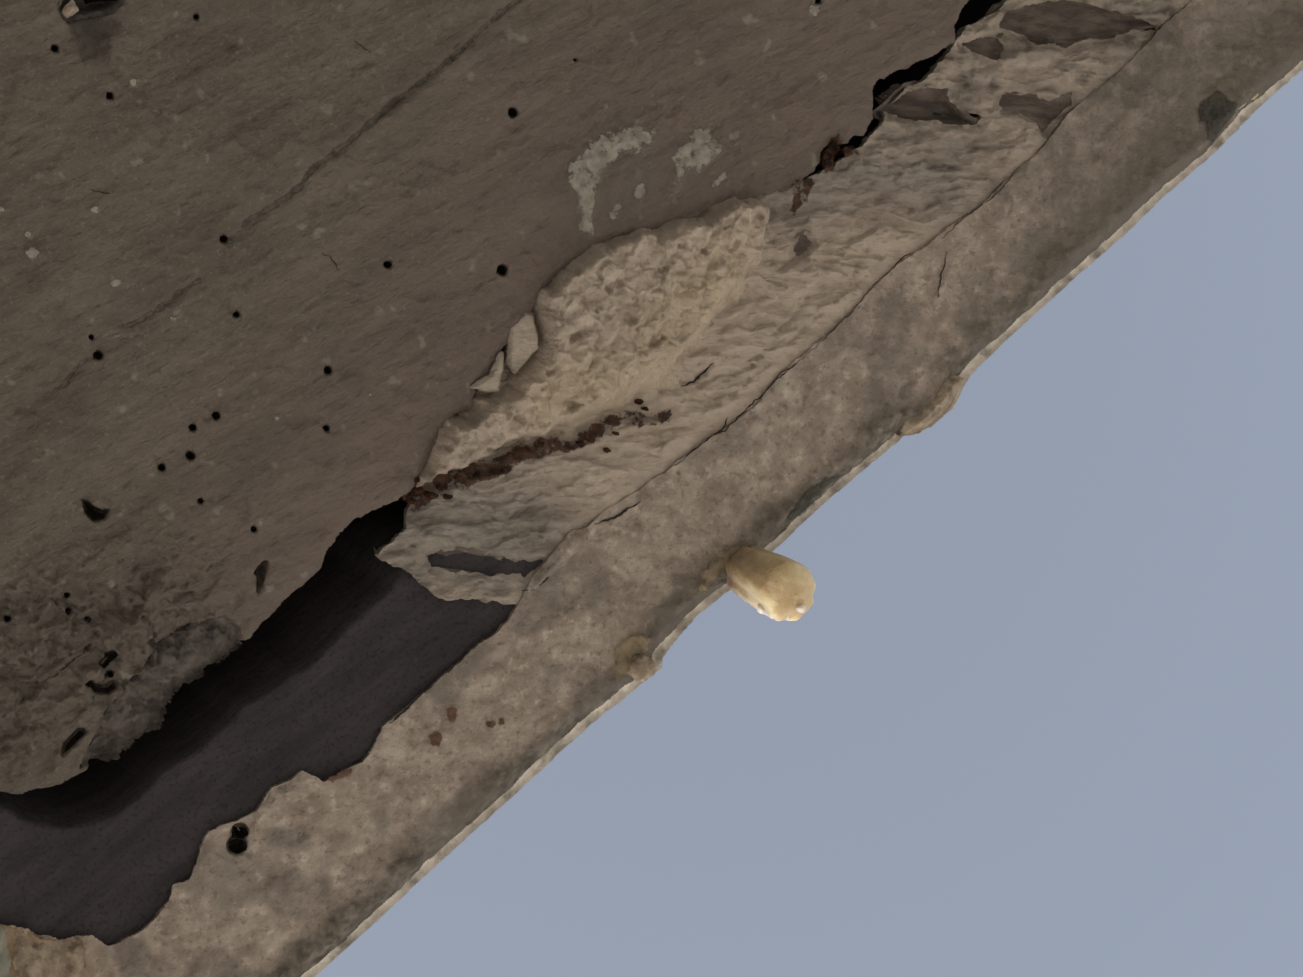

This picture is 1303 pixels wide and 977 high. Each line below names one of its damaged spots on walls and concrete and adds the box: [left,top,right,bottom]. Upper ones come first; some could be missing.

spalling [57,0,124,22]
spalling [954,0,1001,34]
spalling [804,48,947,179]
leakage [568,125,654,237]
leakage [671,128,727,188]
peeling [470,312,539,392]
rust [402,399,672,512]
spalling [428,553,543,577]
spalling [0,496,515,977]